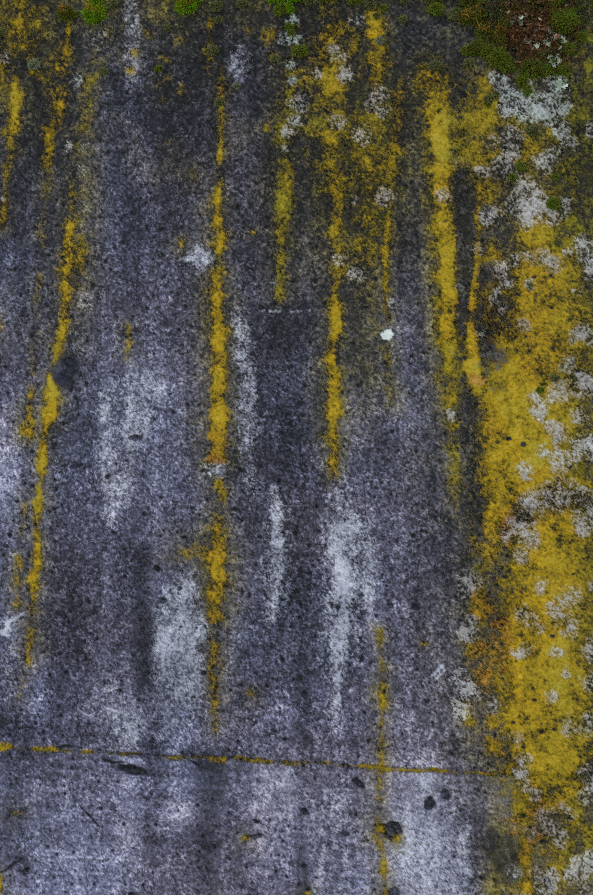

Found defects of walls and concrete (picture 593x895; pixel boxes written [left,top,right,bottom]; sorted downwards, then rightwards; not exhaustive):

leakage [12,219,87,607]
leakage [100,376,163,525]
leakage [104,517,228,750]
leakage [186,181,256,500]
leakage [263,486,284,622]
leakage [274,159,293,301]
leakage [325,181,345,476]
leakage [323,492,377,717]
leakage [416,63,495,498]
crack [0,742,329,766]
leakage [374,765,533,895]
crack [360,764,593,779]